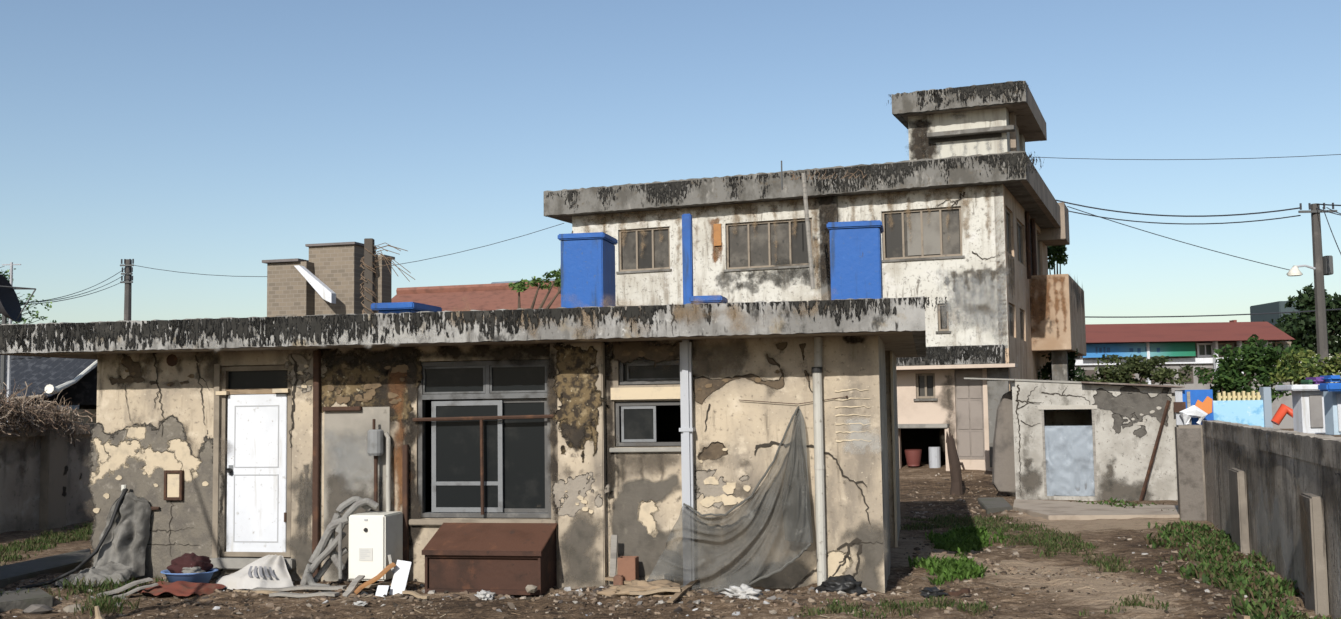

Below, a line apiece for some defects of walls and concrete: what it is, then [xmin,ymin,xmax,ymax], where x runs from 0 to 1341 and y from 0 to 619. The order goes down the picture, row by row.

damp [888,81,1029,110]
crack [125,353,164,437]
peeling [109,354,194,386]
crack [195,355,210,425]
peeling [284,346,423,422]
damp [0,136,1044,592]
peeling [692,342,813,404]
spalling [1093,386,1172,438]
spalling [62,415,224,578]
spalling [550,463,610,518]
peeling [694,441,751,517]
crack [754,441,882,577]